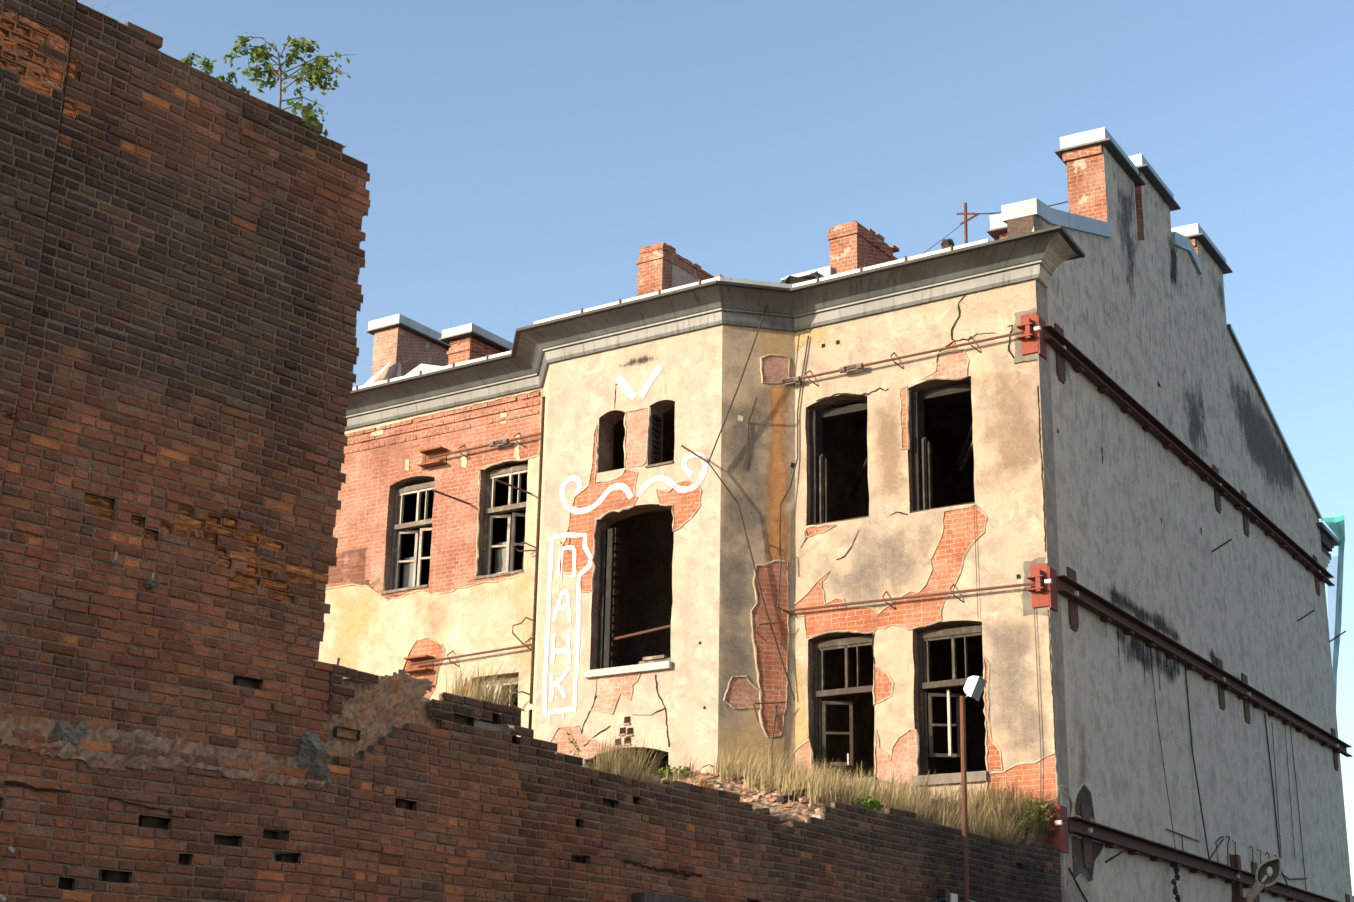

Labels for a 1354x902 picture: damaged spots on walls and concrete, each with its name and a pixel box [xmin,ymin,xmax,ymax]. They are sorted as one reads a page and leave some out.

spalling [0,7,80,120]
crack [0,0,77,499]
flaking render [899,340,970,450]
water stain [1231,380,1293,488]
flaking render [723,504,988,738]
water stain [1097,587,1180,682]
crack [0,781,71,793]
crack [109,797,192,818]
spalling [0,637,501,787]
flaking render [550,673,642,765]
flaking render [794,739,813,773]